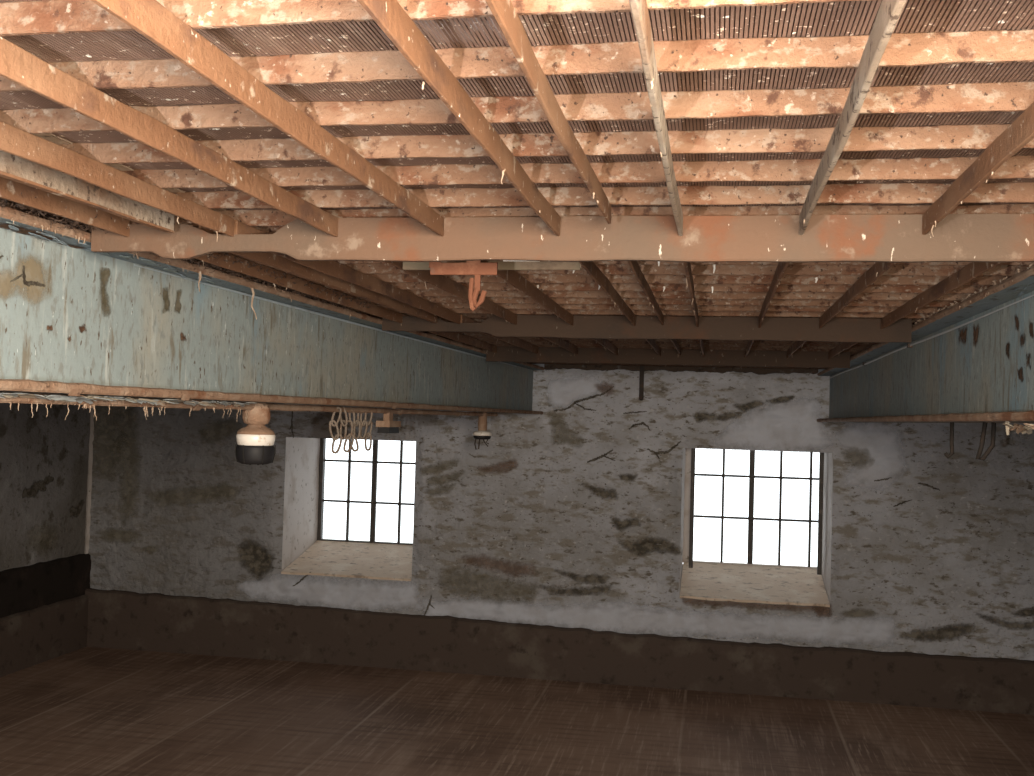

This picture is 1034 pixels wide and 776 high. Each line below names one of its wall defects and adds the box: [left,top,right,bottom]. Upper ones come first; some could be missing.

corrosion [0,257,46,302]
corrosion [100,268,111,316]
corrosion [162,288,181,313]
corrosion [959,325,979,346]
corrosion [1006,315,1034,382]
peeling [0,393,257,407]
peeling [1003,423,1034,435]
leakage [441,570,536,601]